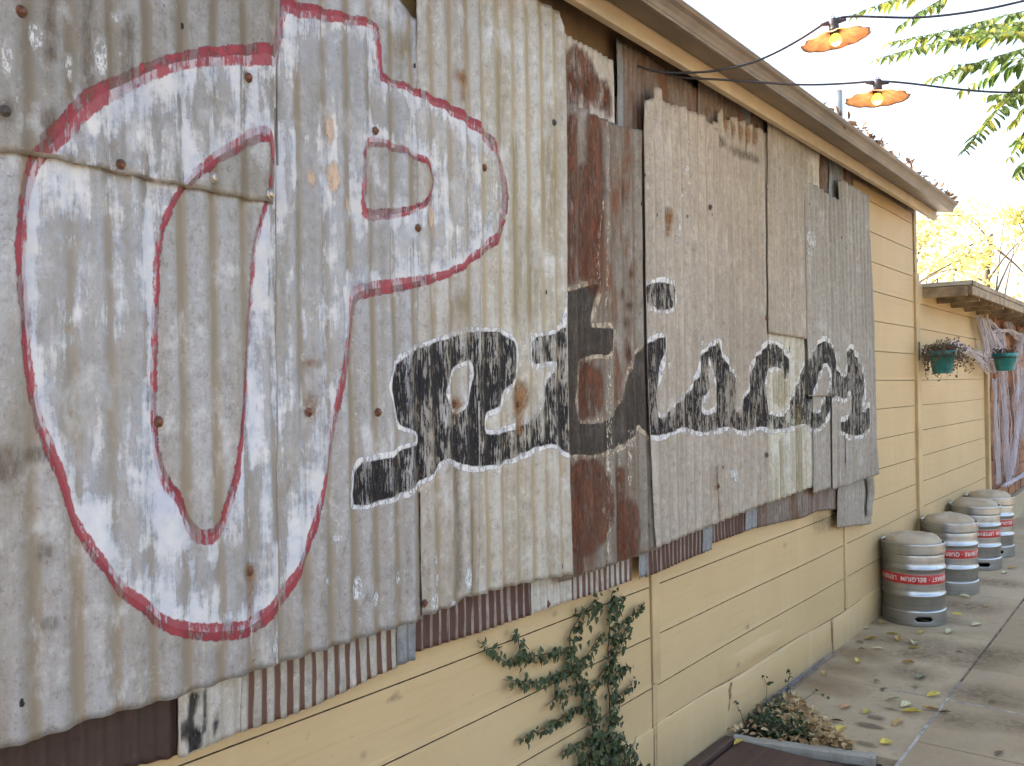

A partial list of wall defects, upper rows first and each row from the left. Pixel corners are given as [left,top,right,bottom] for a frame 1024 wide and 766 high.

rust [566,46,610,294]
rust [515,383,528,435]
rust [570,458,640,575]